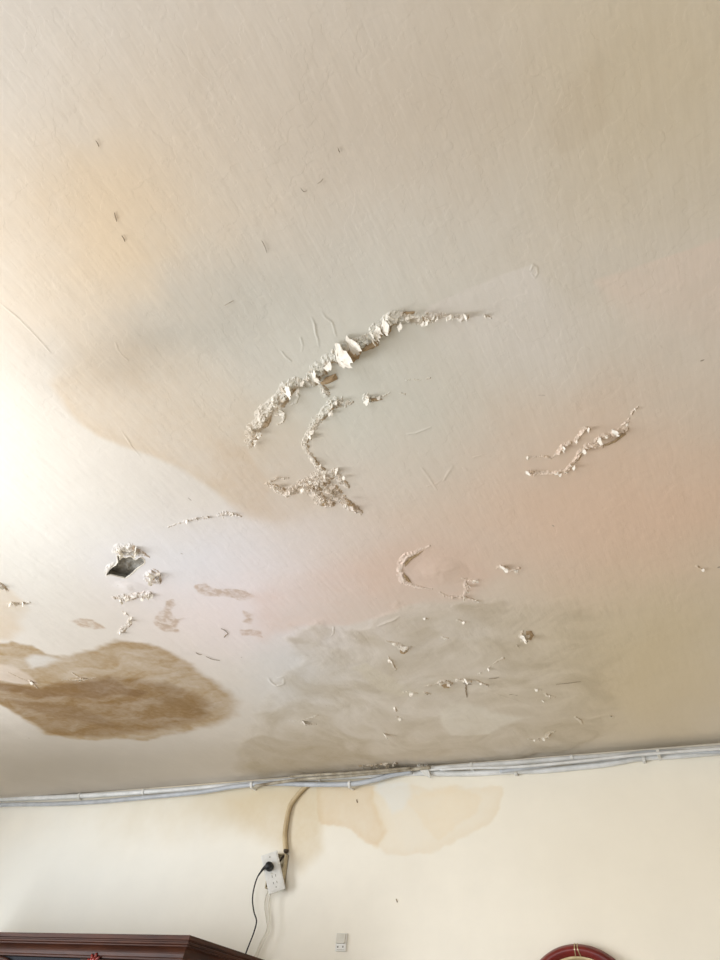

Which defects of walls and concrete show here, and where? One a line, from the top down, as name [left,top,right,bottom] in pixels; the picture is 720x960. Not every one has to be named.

peeling [244,309,469,516]
peeling [524,406,639,477]
spalling [104,542,162,636]
peeling [396,545,479,603]
peeling [514,630,534,649]
damp [0,529,640,882]
peeling [403,657,505,697]